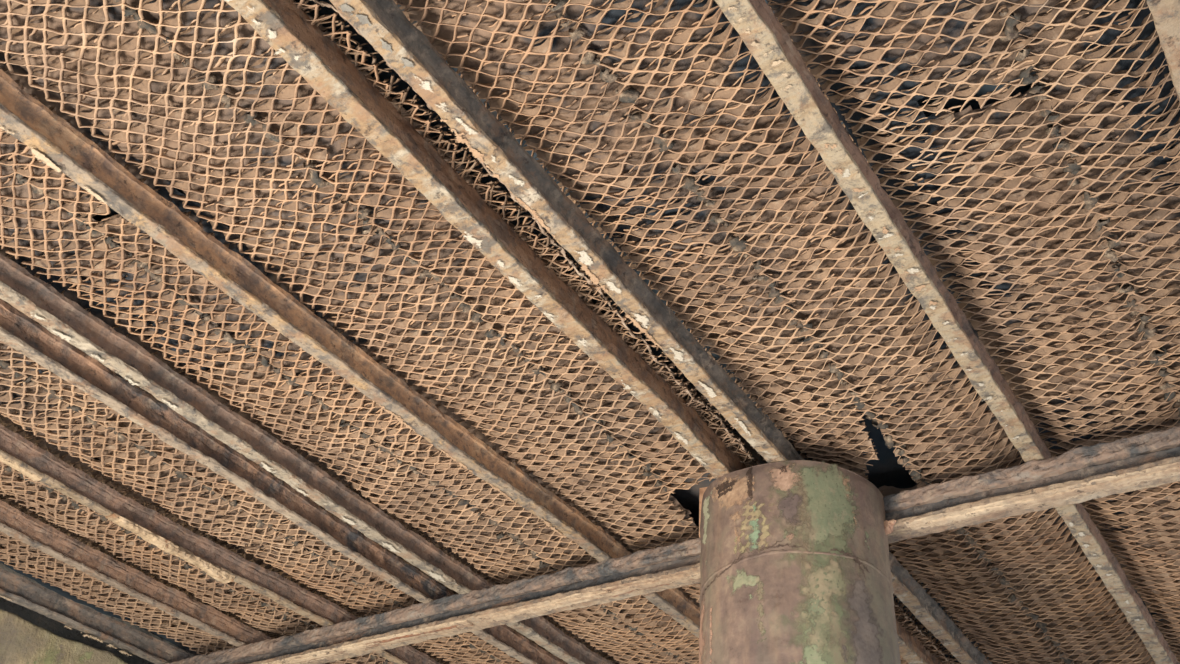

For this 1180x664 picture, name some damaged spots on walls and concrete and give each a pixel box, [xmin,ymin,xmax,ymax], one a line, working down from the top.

corrosion [712,476,750,541]
corrosion [770,465,802,540]
peeling [734,464,870,664]
corrosion [699,604,713,664]
peeling [726,570,766,634]